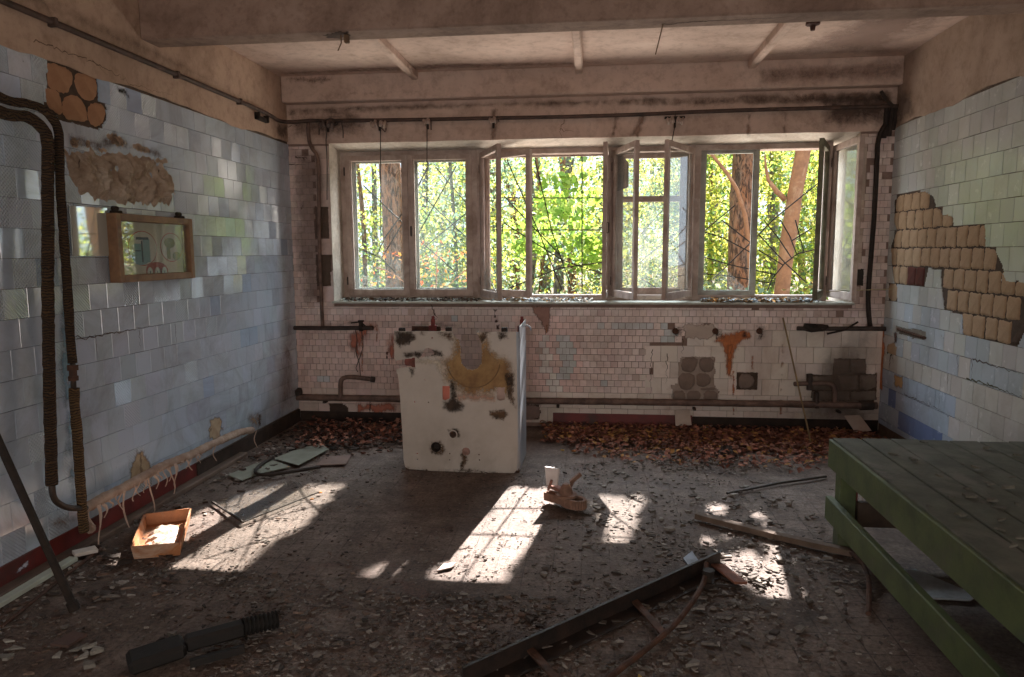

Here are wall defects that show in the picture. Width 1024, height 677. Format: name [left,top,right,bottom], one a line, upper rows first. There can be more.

flaking render [44,60,175,207]
spalling [888,192,1024,346]
spalling [671,356,719,400]
corrosion [716,330,750,393]
spalling [849,359,877,401]
peeling [131,451,150,478]